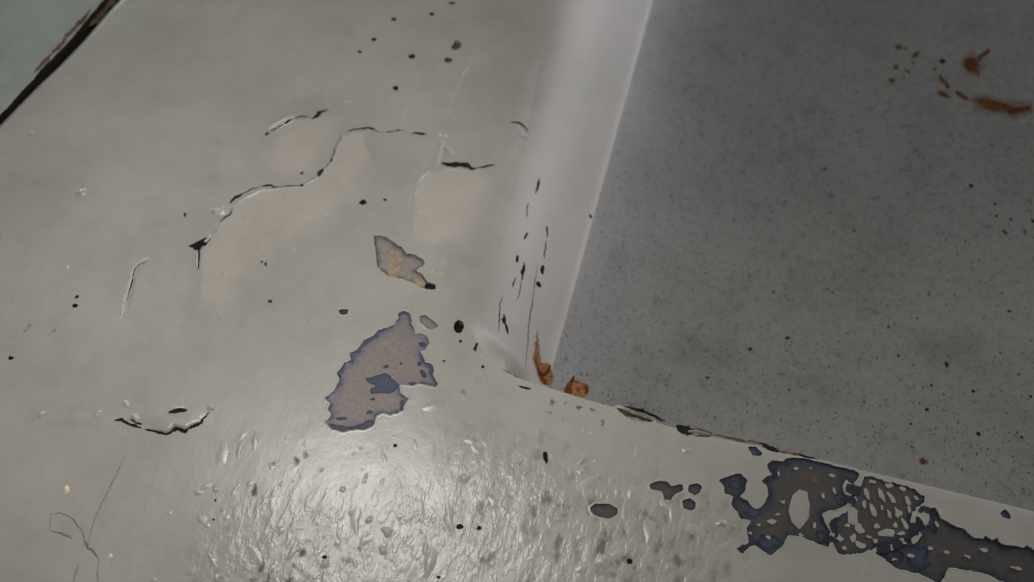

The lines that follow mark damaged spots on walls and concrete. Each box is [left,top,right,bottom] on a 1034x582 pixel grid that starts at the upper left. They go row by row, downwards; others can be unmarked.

corrosion [964,49,990,74]
corrosion [933,67,1031,115]
peeling [371,233,439,292]
peeling [322,309,445,435]
corrosion [533,335,553,386]
corrosion [564,374,588,397]
crack [95,400,209,435]
crack [50,453,127,582]
peeling [588,501,620,521]
peeling [647,479,704,512]
peeling [717,445,1034,582]